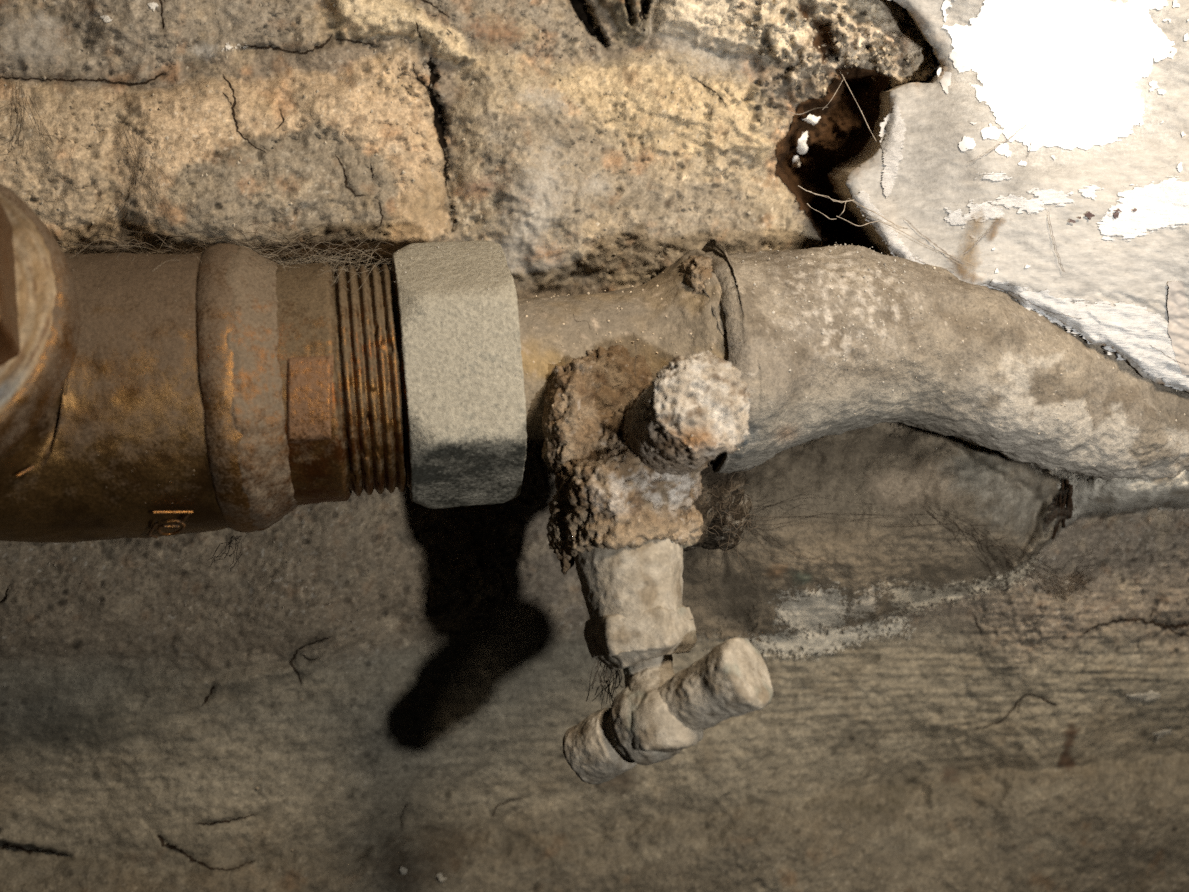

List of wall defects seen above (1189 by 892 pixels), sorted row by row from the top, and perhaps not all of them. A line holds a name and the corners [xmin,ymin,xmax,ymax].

crack [624,0,651,31]
crack [412,0,458,232]
spalling [775,4,925,264]
peeling [937,0,1189,166]
peeling [975,171,1012,181]
peeling [944,184,1104,238]
peeling [1096,162,1189,241]
peeling [980,268,1189,391]
crack [1084,609,1189,637]
crack [0,843,69,856]